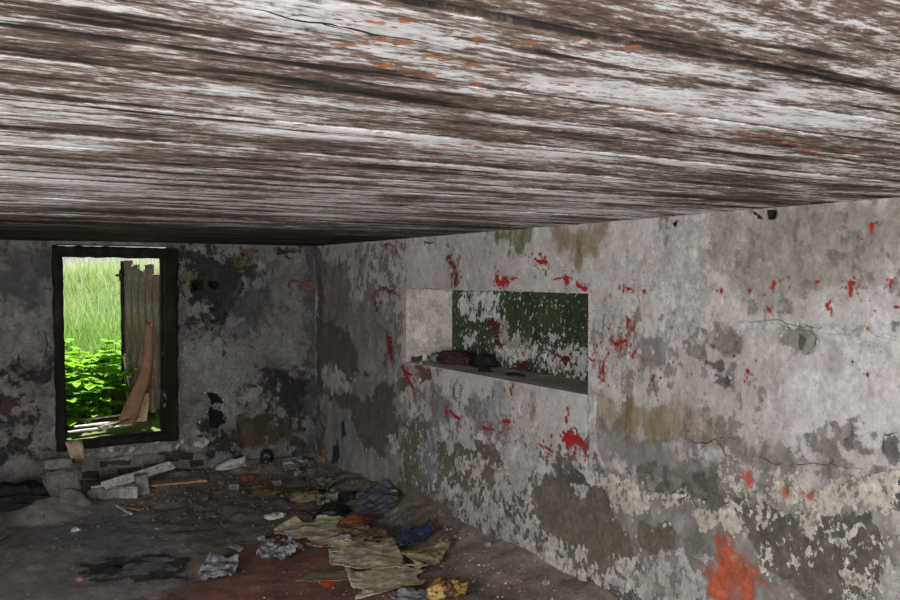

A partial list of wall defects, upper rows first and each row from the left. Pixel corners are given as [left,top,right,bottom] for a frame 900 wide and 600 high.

leakage [172,243,408,486]
peeling [159,239,720,600]
peeling [457,280,900,600]
leakage [586,398,900,600]
crack [692,437,859,484]
peeling [826,212,885,291]